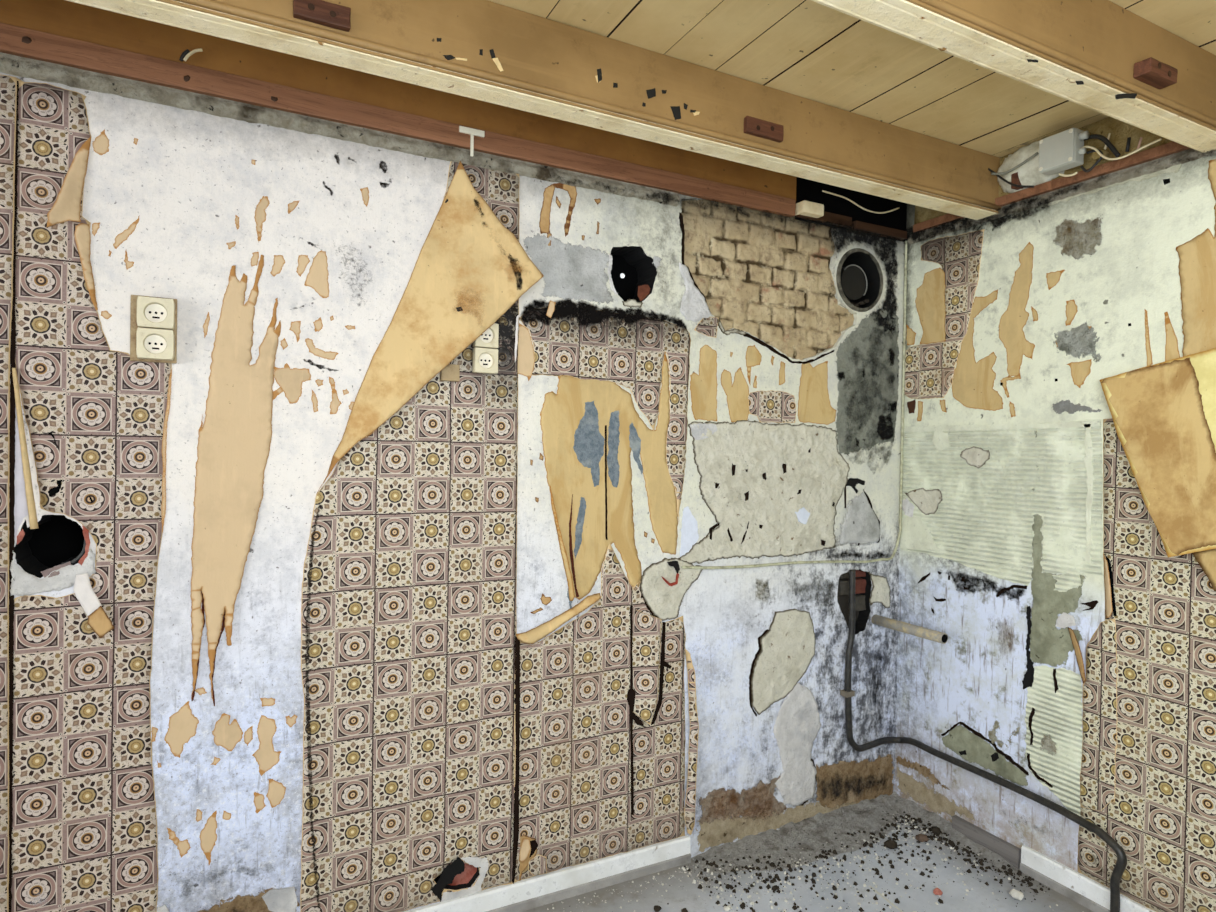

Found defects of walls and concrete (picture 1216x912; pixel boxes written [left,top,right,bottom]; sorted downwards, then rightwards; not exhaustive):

peeling [250,196,329,298]
spalling [679,200,854,360]
spalling [1053,215,1103,260]
peeling [273,161,544,493]
damp [553,175,1081,463]
spalling [1053,321,1101,362]
damp [795,580,834,610]
damp [948,571,1024,602]
damp [865,652,886,722]
peeling [210,698,297,813]
damp [814,754,950,809]
spalling [431,857,489,902]